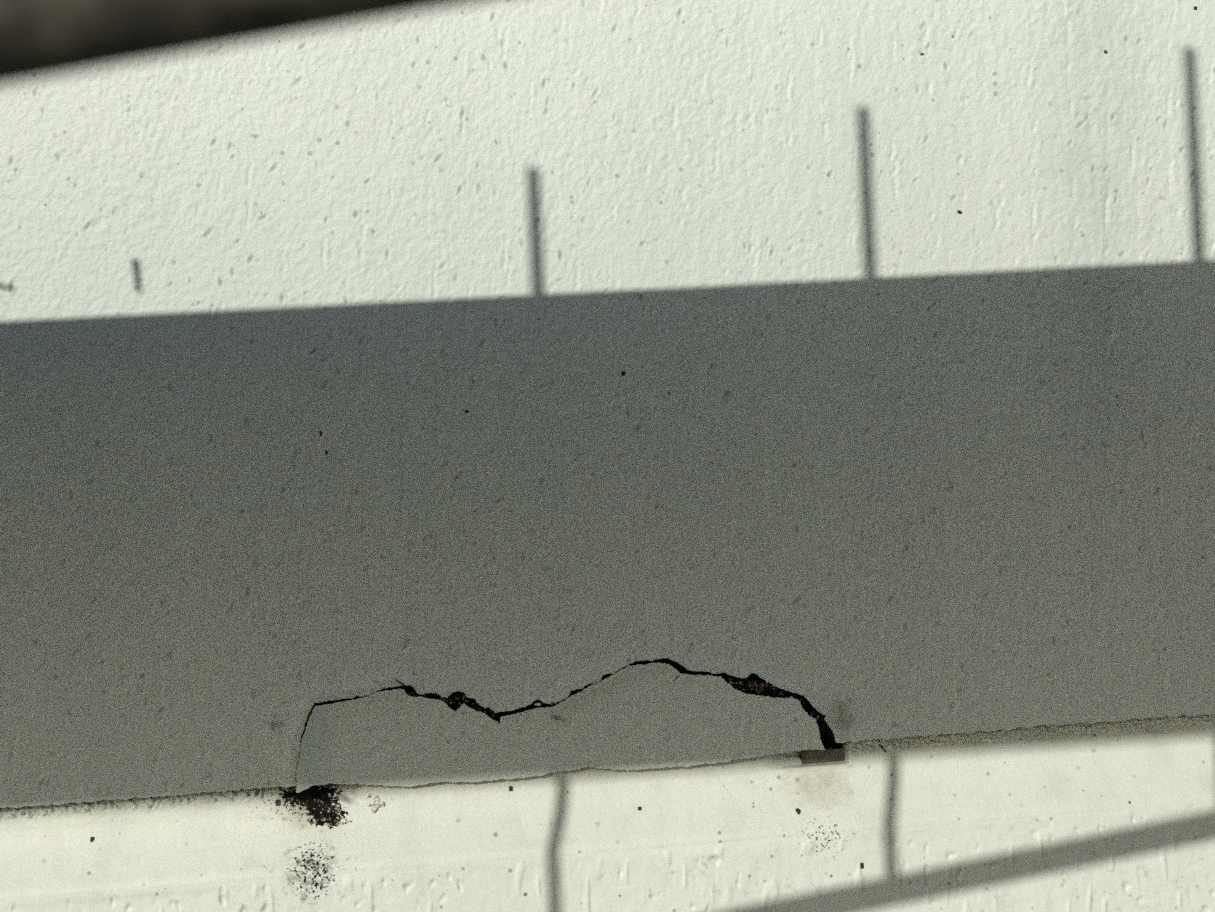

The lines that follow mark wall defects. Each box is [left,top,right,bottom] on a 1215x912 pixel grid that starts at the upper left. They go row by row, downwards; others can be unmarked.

crack [290,658,842,783]